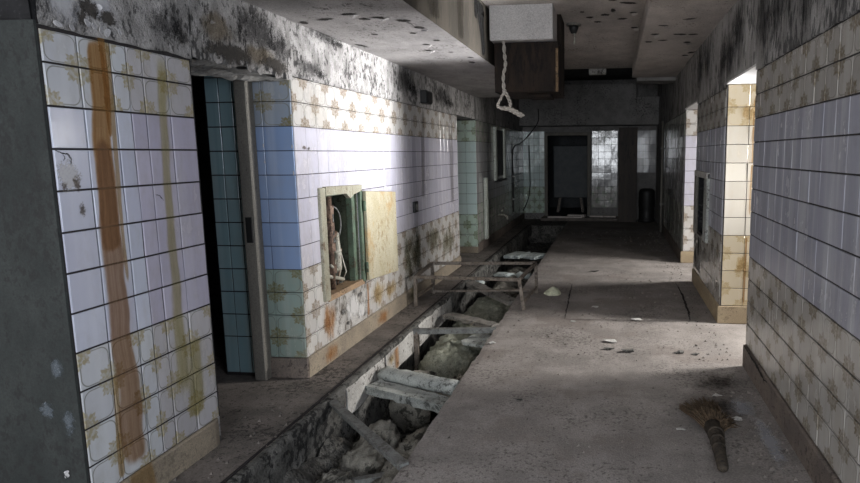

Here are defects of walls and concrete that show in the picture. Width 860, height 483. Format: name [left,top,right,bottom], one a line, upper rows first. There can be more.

leakage [474,0,485,55]
crack [676,284,691,320]